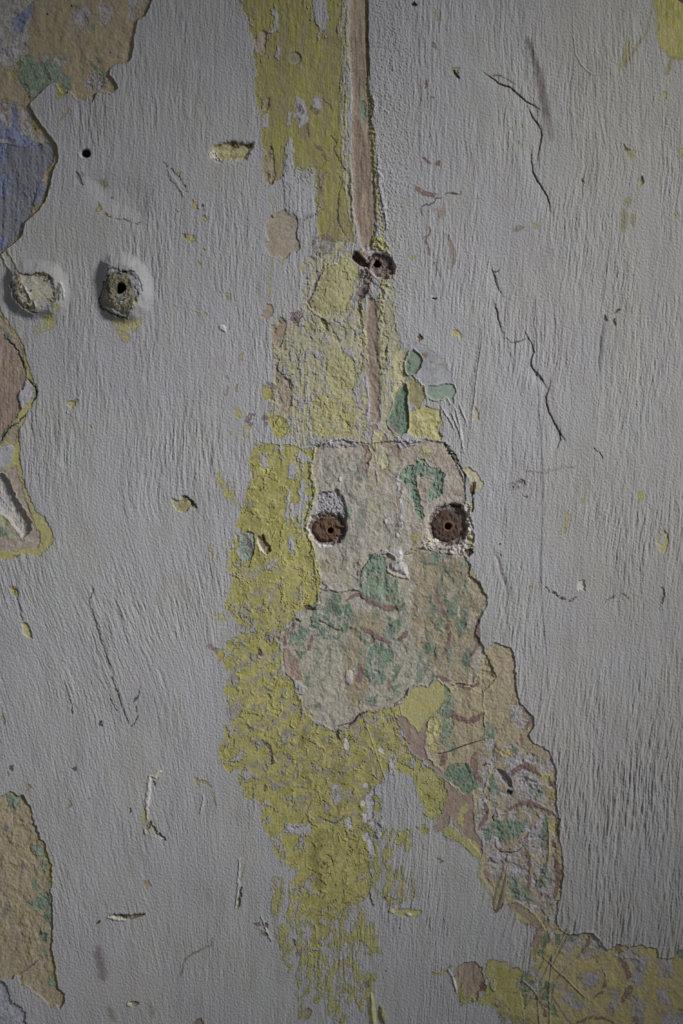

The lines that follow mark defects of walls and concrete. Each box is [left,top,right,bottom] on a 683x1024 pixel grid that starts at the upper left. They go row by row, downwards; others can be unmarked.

peeling [0,0,152,253]
crack [490,75,550,207]
peeling [0,310,55,561]
peeling [207,0,683,1024]
crack [492,270,562,444]
peeling [0,784,65,1024]